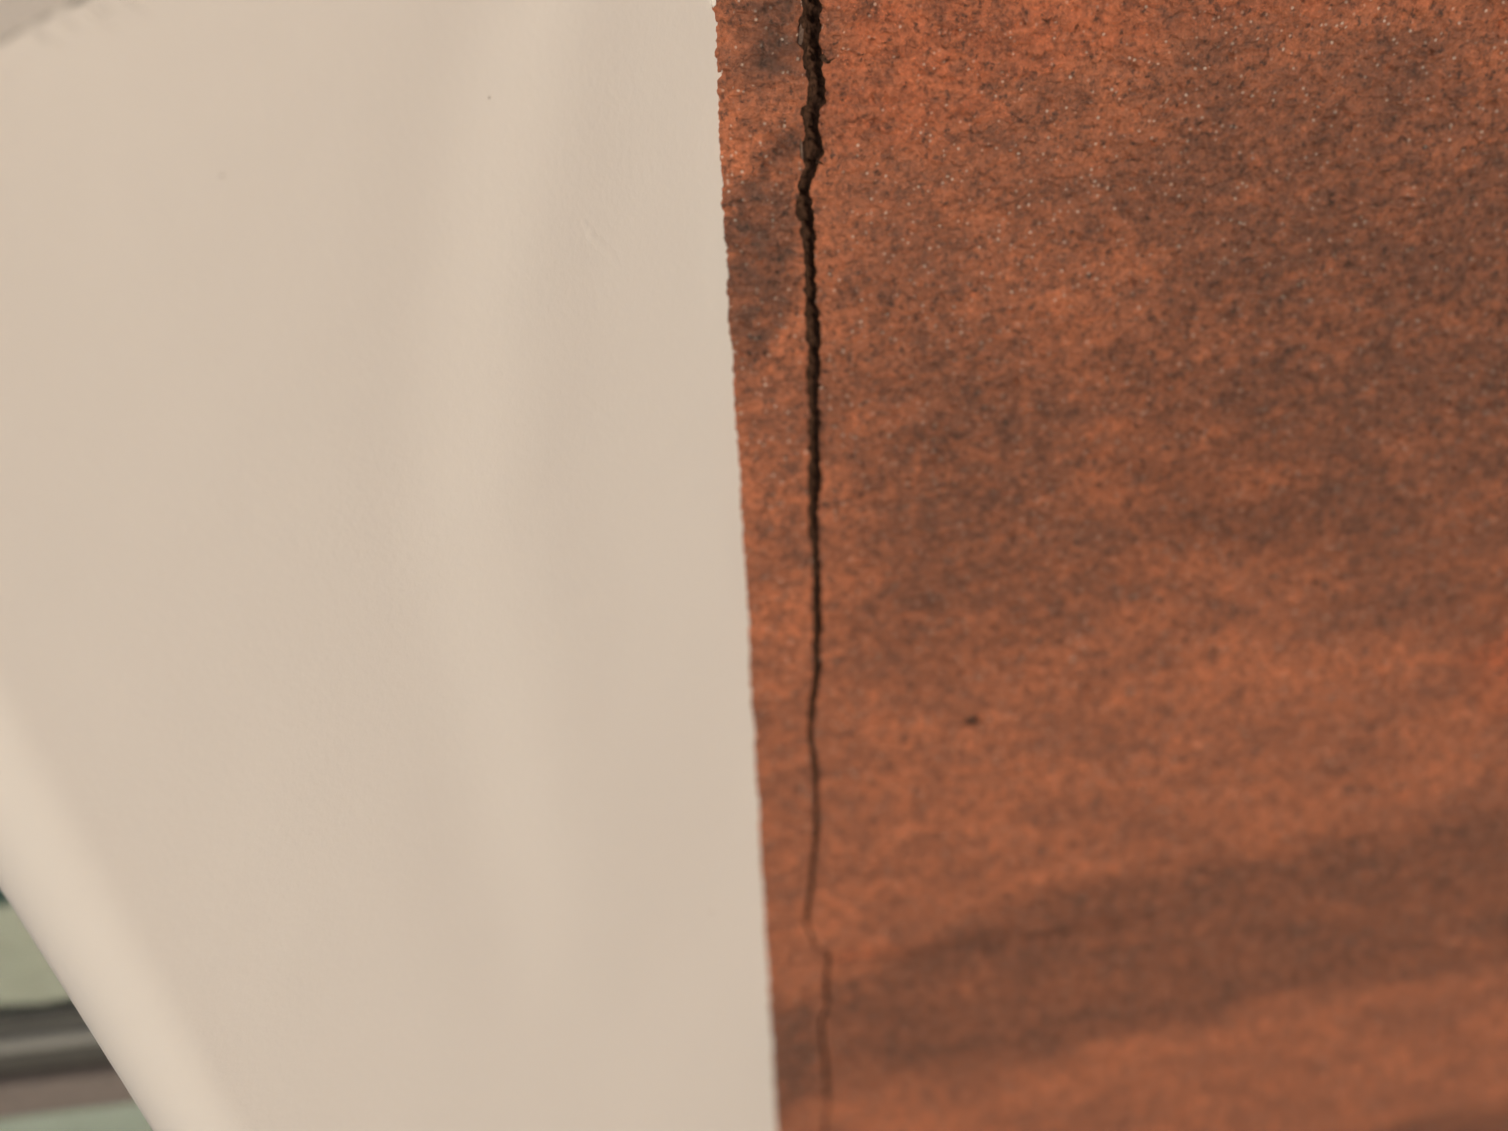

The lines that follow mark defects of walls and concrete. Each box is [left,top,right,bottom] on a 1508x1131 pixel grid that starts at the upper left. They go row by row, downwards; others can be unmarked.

crack [795,0,835,1131]